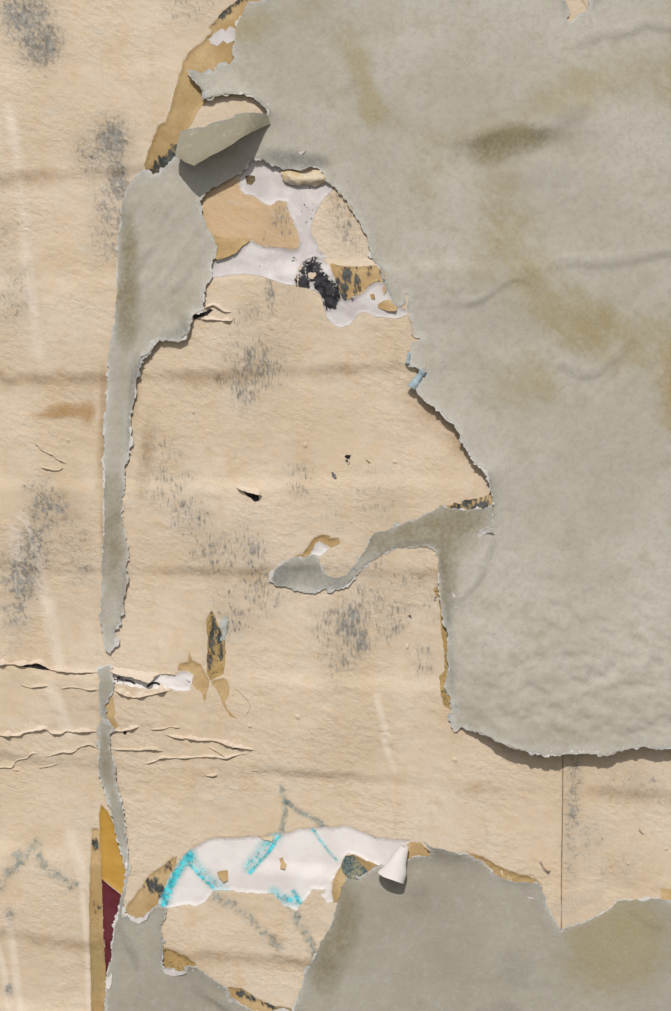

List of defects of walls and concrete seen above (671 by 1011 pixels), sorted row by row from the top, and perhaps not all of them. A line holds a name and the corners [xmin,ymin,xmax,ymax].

peeling [144,0,260,175]
peeling [211,159,408,328]
peeling [200,303,233,321]
peeling [123,825,430,919]
peeling [465,851,542,888]
peeling [89,828,106,1011]
peeling [162,948,196,971]
peeling [228,987,292,1011]